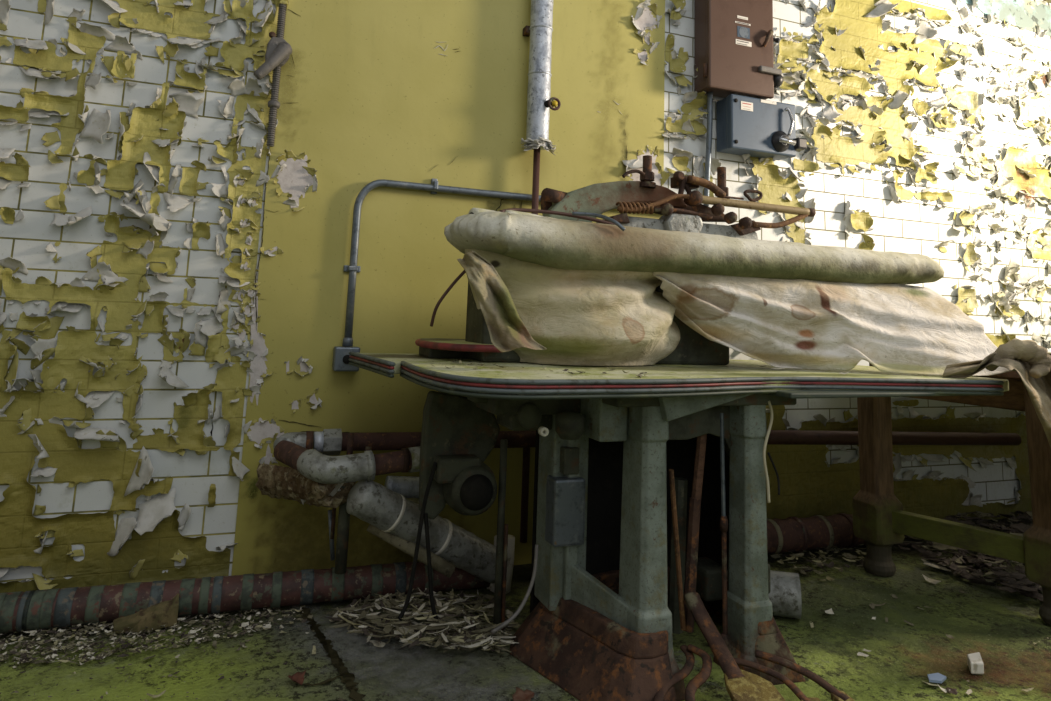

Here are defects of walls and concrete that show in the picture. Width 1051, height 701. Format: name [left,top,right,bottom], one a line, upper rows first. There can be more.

peeling [622,0,721,197]
peeling [742,0,1051,349]
peeling [0,0,322,593]
peeling [766,405,858,431]
peeling [766,444,860,519]
peeling [891,399,1032,521]